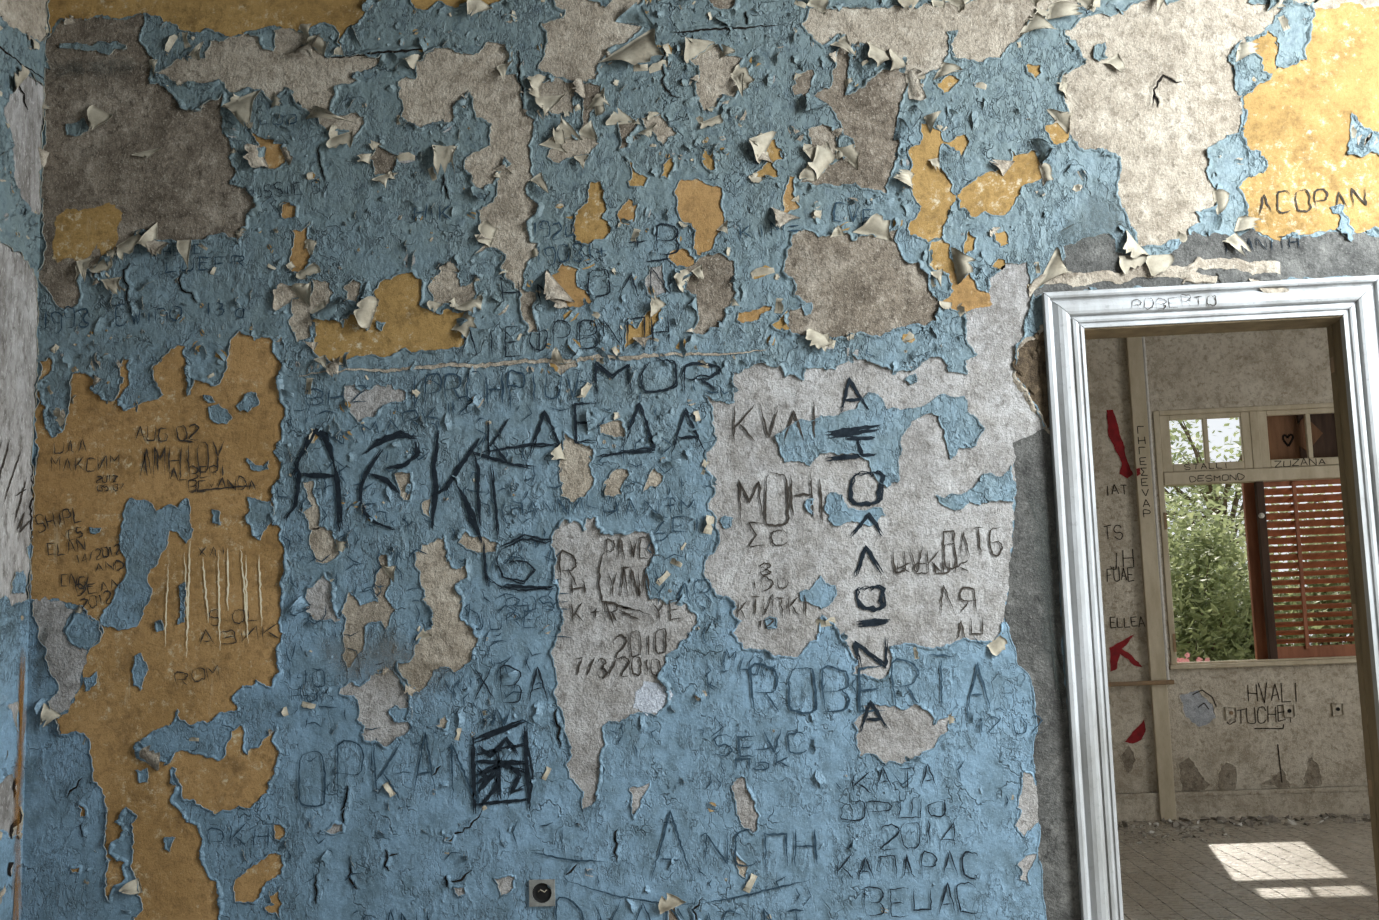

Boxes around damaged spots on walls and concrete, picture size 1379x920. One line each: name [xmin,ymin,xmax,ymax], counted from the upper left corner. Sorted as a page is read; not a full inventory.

crack [0,16,44,110]
crack [1148,71,1182,108]
flaking render [347,135,422,203]
peeling [990,225,1017,248]
peeling [526,336,586,378]
flaking render [339,375,432,430]
peeling [640,428,693,494]
flaking render [327,440,501,750]
flaking render [540,515,701,812]
peeling [810,712,832,791]
peeling [232,820,289,920]
peeling [725,847,757,893]